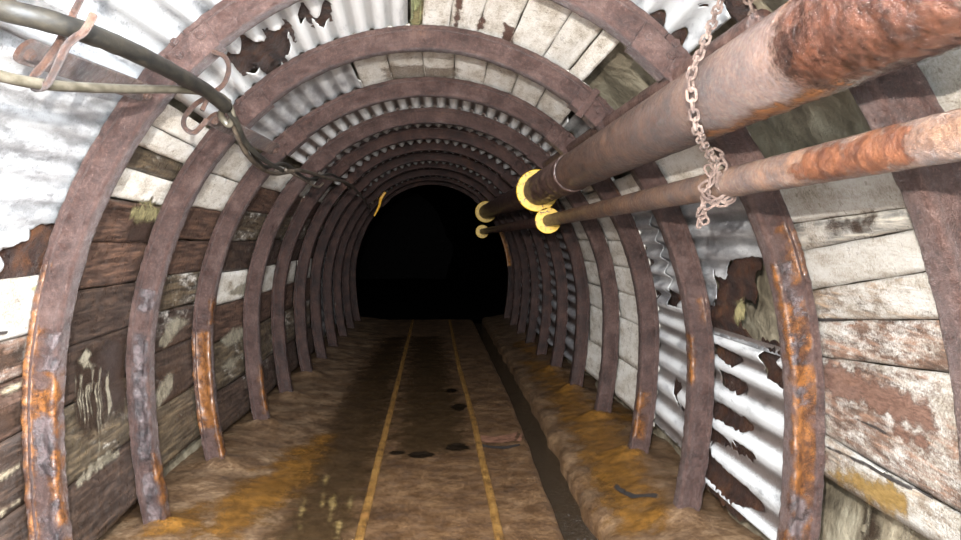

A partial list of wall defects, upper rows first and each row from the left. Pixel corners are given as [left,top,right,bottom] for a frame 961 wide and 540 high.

rust [788,123,917,181]
rust [20,264,69,540]
rust [191,299,226,456]
rust [770,223,908,540]
peeling [792,360,939,454]